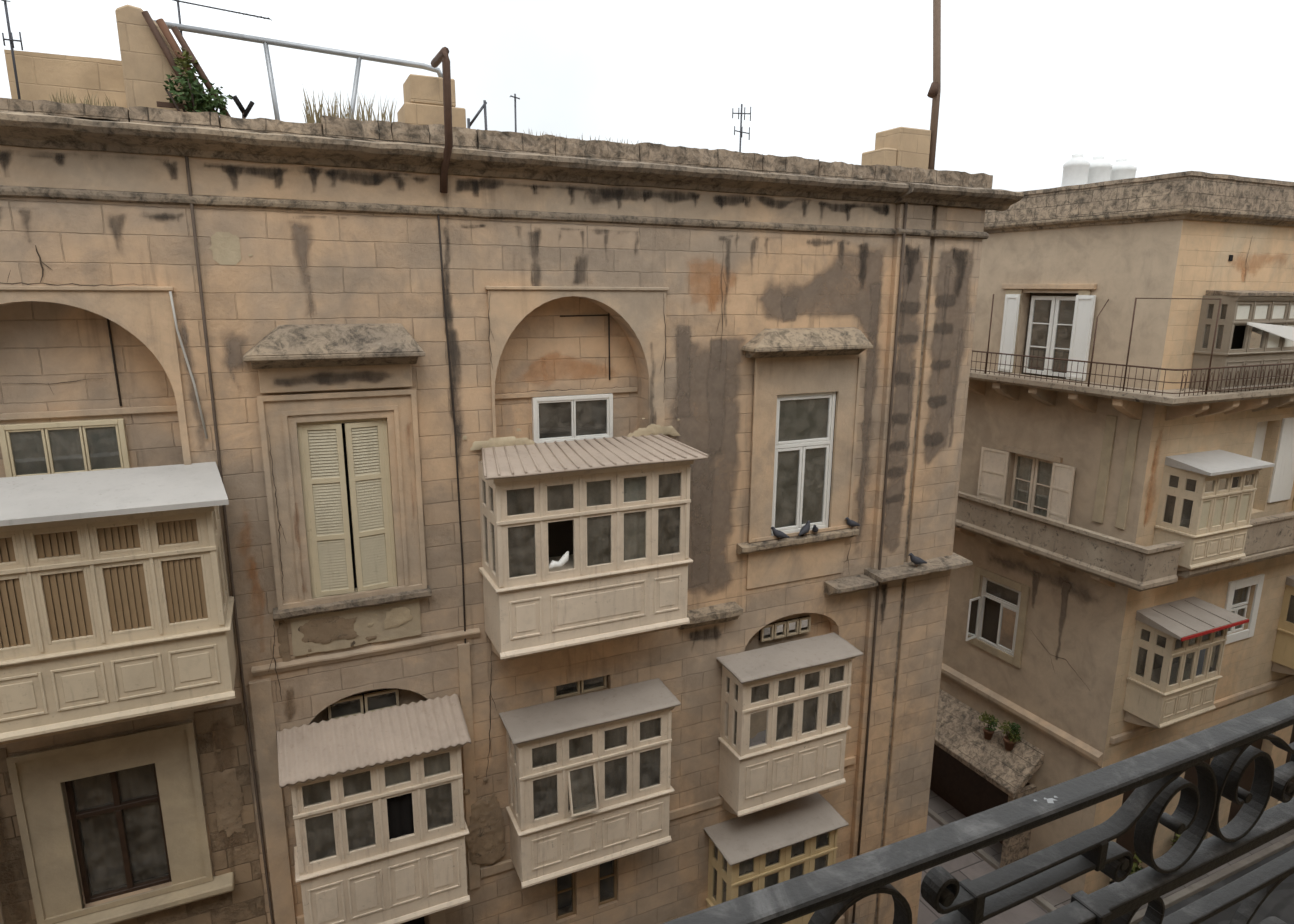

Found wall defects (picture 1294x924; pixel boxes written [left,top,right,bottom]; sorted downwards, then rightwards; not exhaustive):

damp [209,166,282,186]
damp [308,168,424,188]
crack [0,245,153,286]
damp [292,224,309,273]
crack [4,378,103,391]
damp [760,241,883,540]
damp [883,246,972,551]
damp [673,326,744,593]